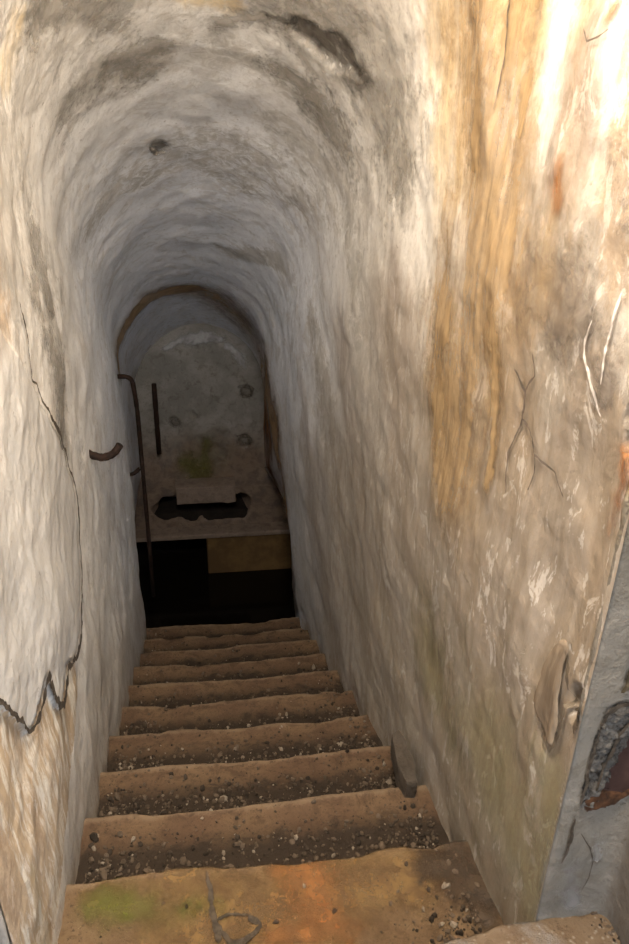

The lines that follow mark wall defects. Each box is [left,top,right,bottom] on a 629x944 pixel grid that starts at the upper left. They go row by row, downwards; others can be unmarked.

damp [24,0,129,53]
damp [101,38,174,89]
damp [211,0,416,201]
damp [540,0,573,165]
crack [505,354,563,496]
crack [0,304,83,734]
spalling [579,671,629,813]